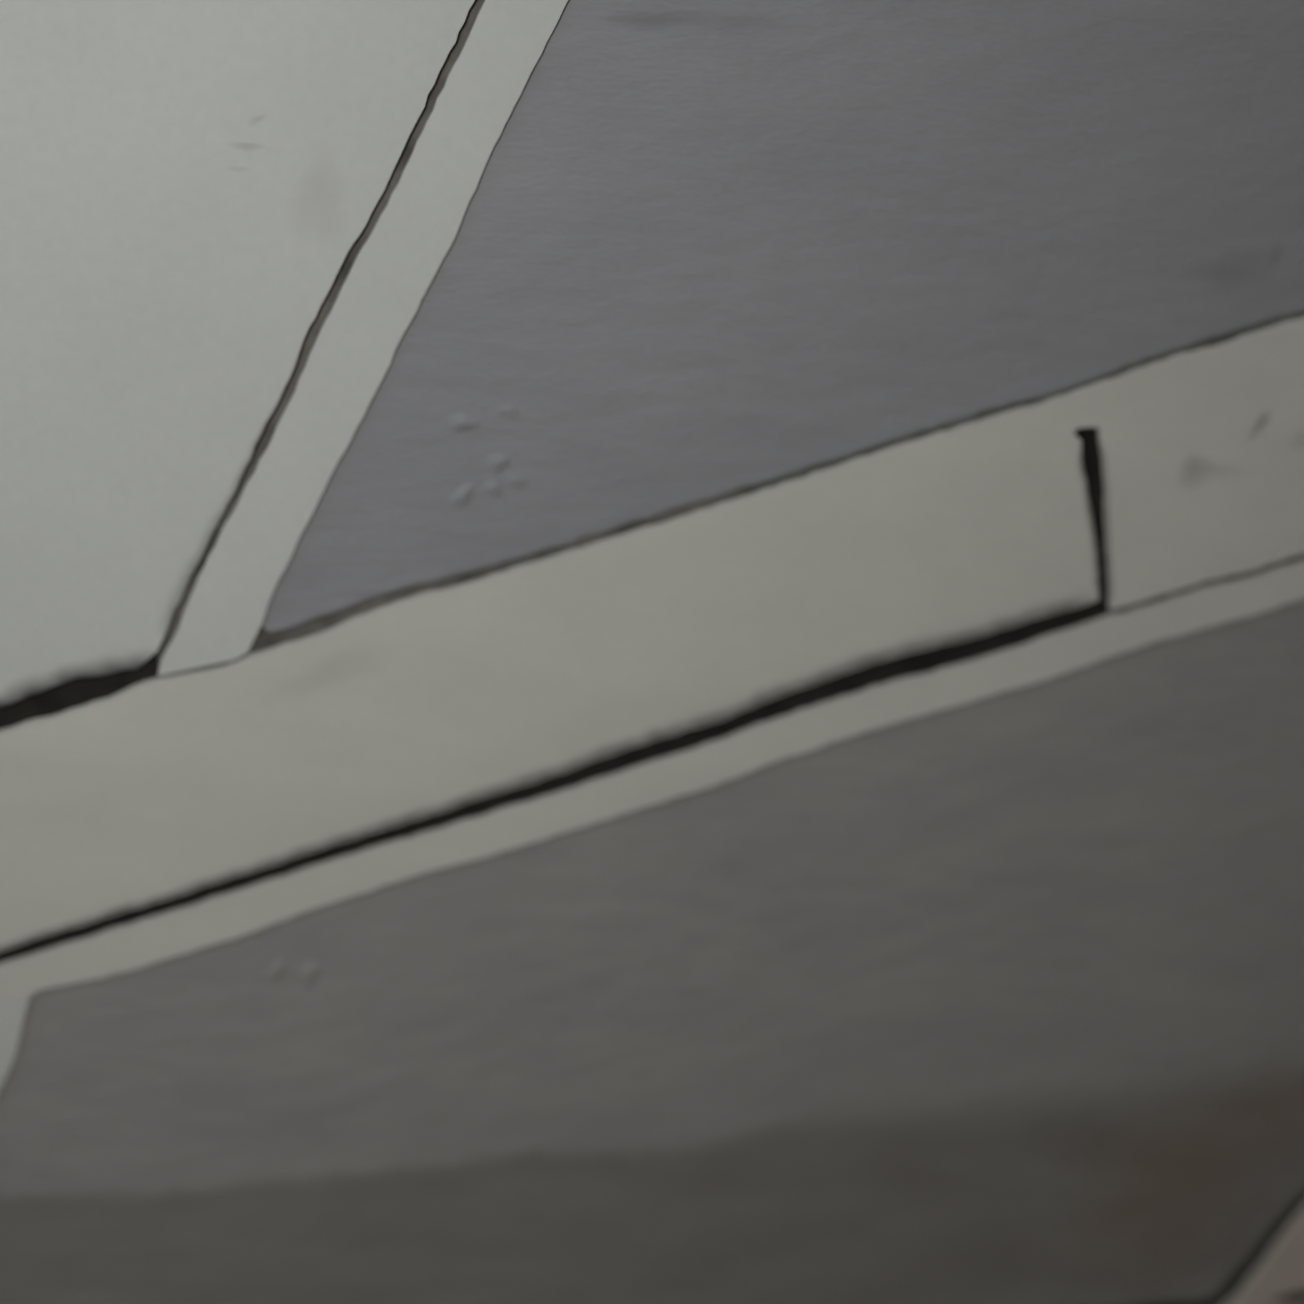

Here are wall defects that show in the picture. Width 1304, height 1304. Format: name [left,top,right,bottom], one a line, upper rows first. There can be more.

crack [0,0,1304,730]
crack [0,427,1304,963]